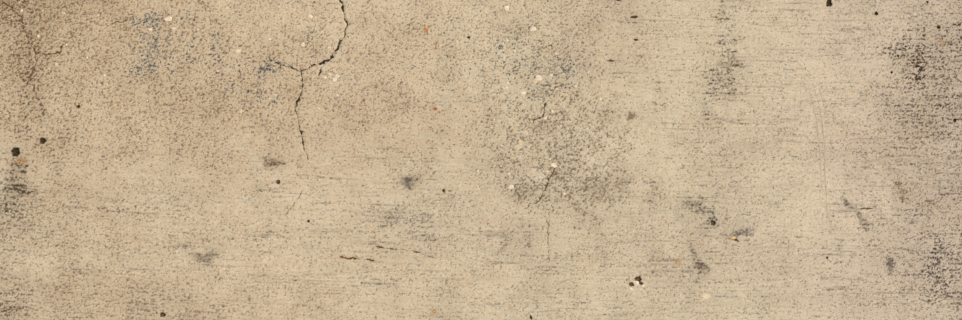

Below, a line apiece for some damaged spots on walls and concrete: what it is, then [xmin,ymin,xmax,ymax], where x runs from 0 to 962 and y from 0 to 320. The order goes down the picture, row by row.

crack [270,0,348,159]